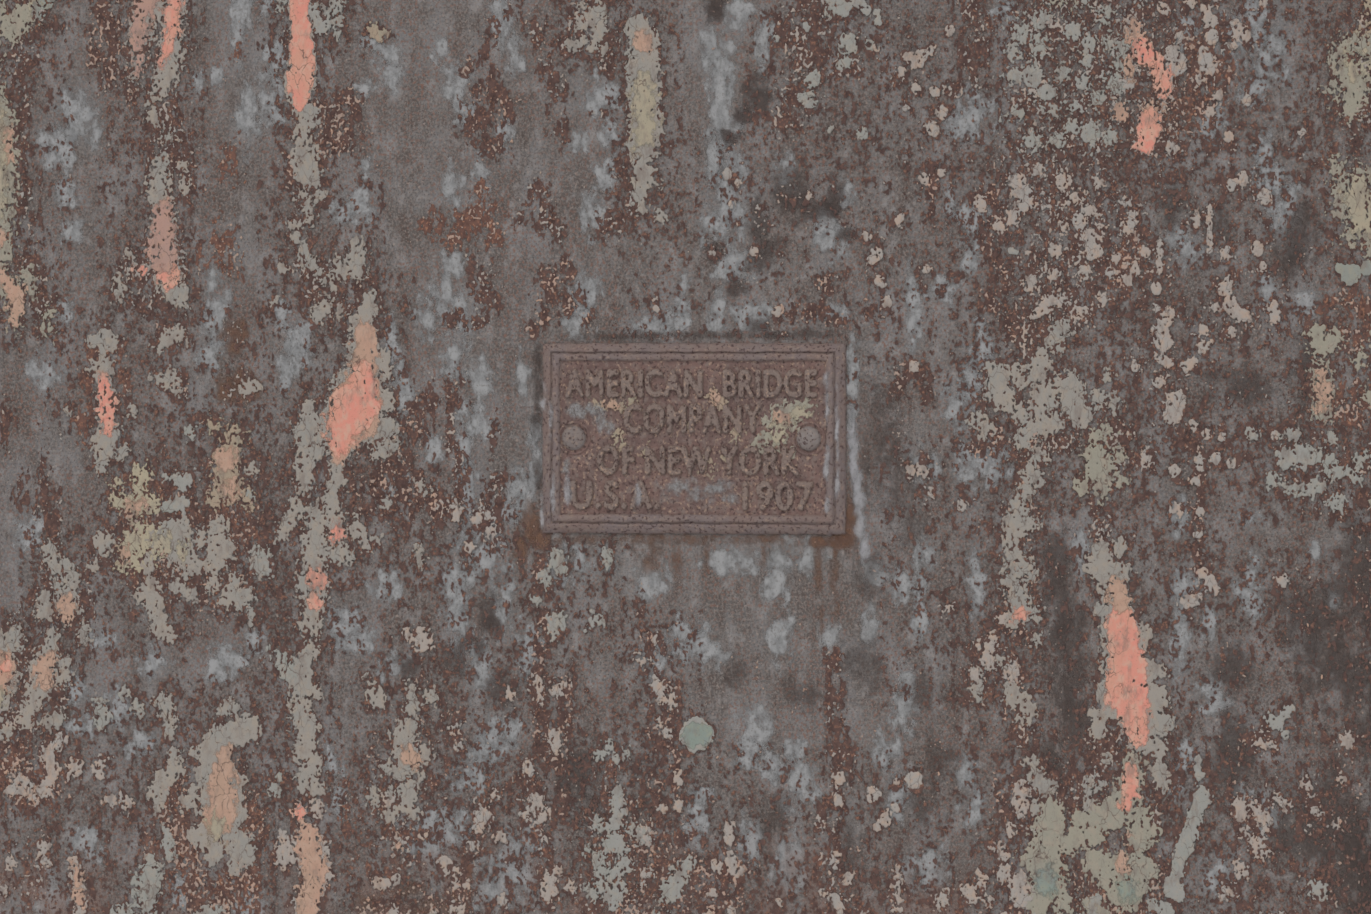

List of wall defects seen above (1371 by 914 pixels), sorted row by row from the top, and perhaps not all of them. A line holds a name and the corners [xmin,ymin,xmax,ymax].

corrosion [708,0,729,21]
corrosion [722,0,864,149]
corrosion [410,0,651,420]
corrosion [706,173,851,294]
corrosion [777,268,886,338]
corrosion [883,0,1240,373]
corrosion [0,0,275,914]
corrosion [863,350,944,462]
peeling [1222,499,1256,530]
corrosion [329,356,764,914]
corrosion [792,386,1225,914]
peeling [770,747,812,814]